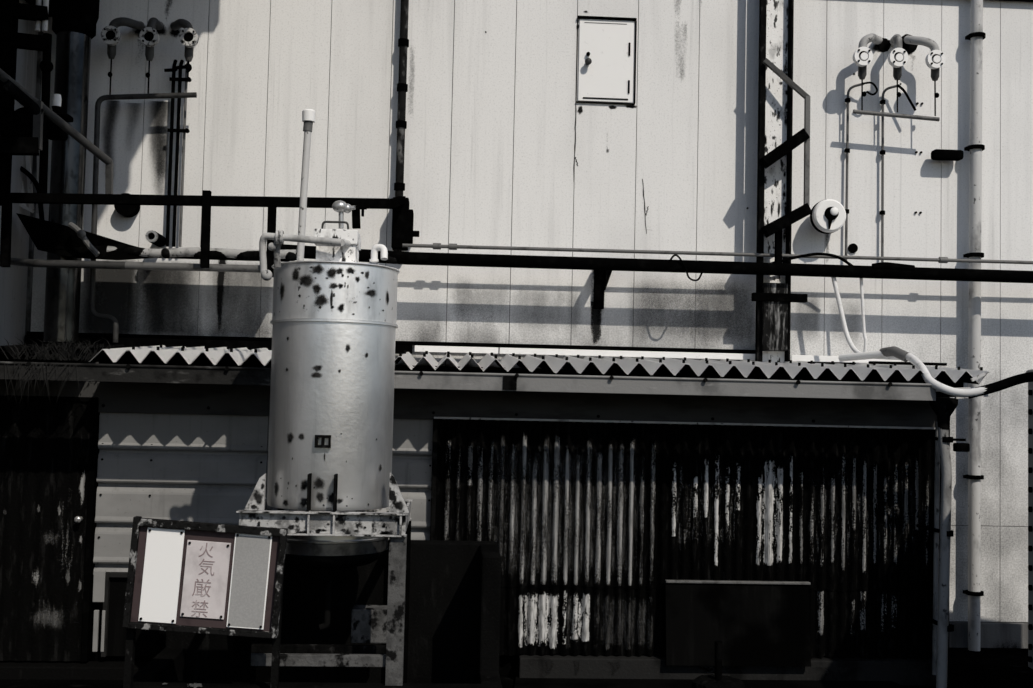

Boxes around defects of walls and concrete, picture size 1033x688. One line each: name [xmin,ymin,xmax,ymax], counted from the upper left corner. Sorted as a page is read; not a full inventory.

leakage [104,100,119,159]
leakage [152,101,169,181]
leakage [83,261,190,334]
leakage [687,288,742,334]